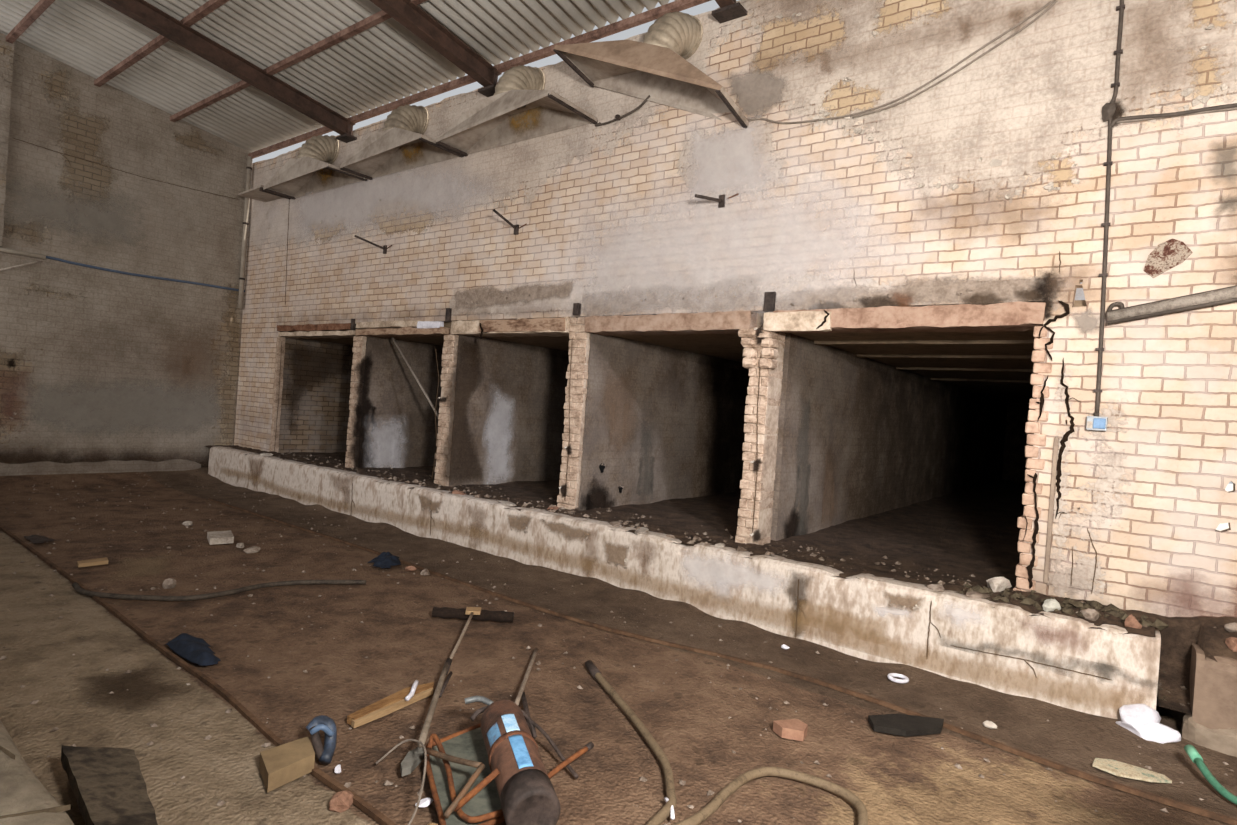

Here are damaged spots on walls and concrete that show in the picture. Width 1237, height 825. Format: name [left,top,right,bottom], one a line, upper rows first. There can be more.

flaking render [752,5,846,74]
flaking render [0,352,28,438]
crack [1023,251,1097,594]
water stain [0,453,162,464]
water stain [581,480,614,510]